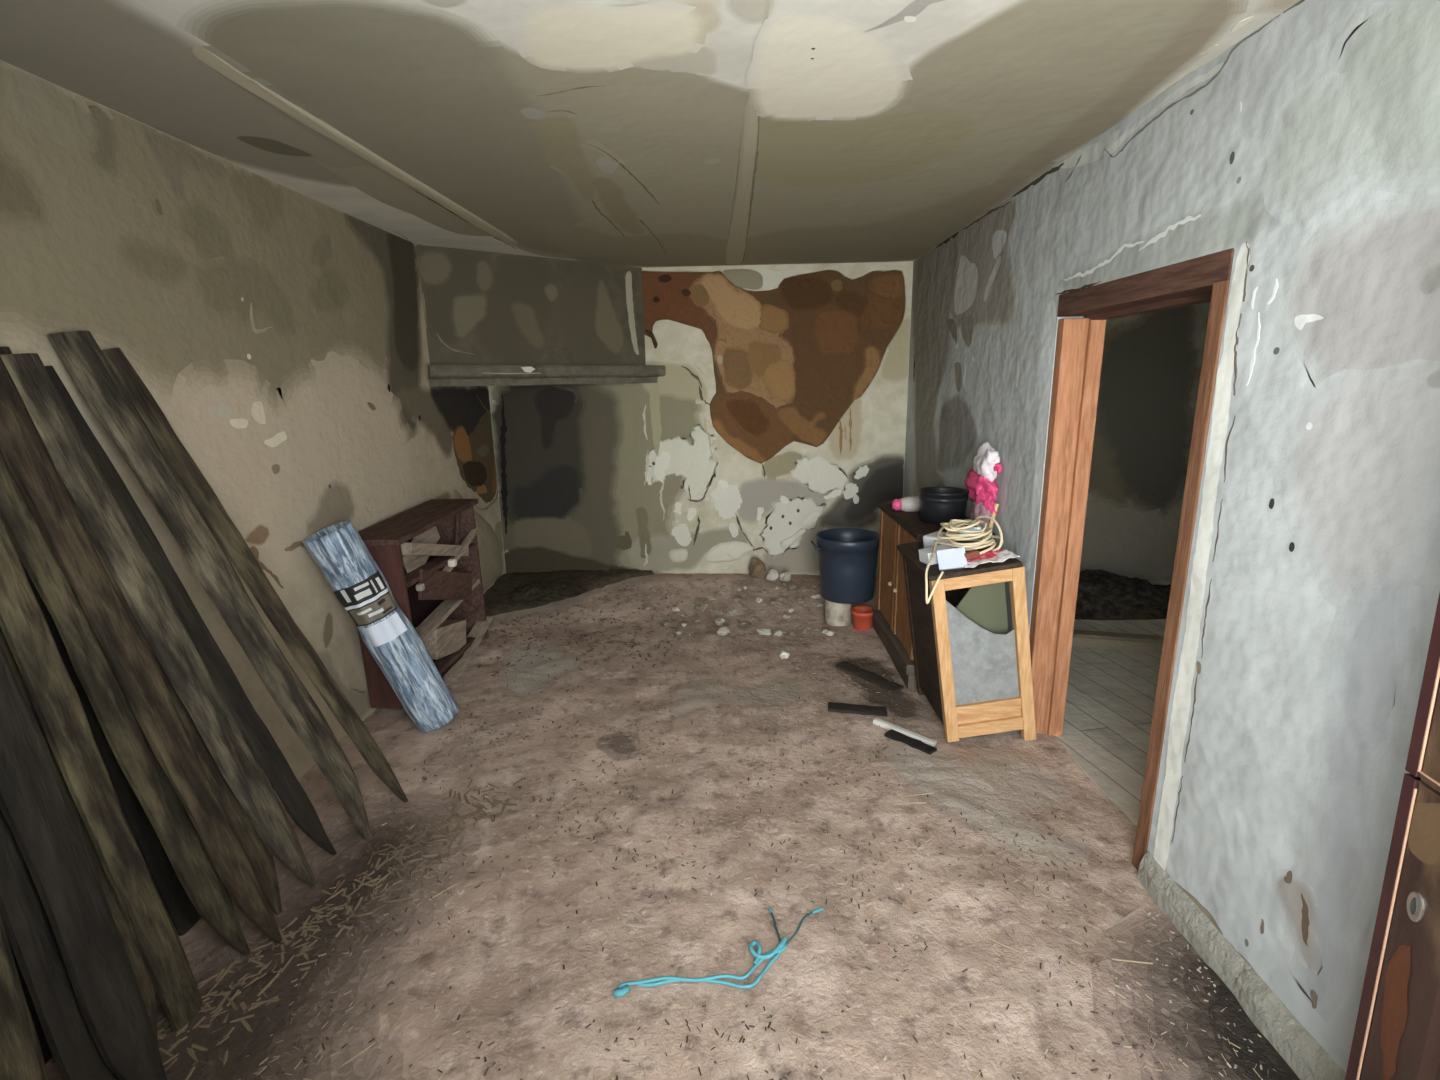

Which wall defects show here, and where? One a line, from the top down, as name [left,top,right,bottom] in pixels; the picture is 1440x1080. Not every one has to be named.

peeling [1058,63,1224,169]
water stain [0,0,1300,588]
flaking render [625,268,905,557]